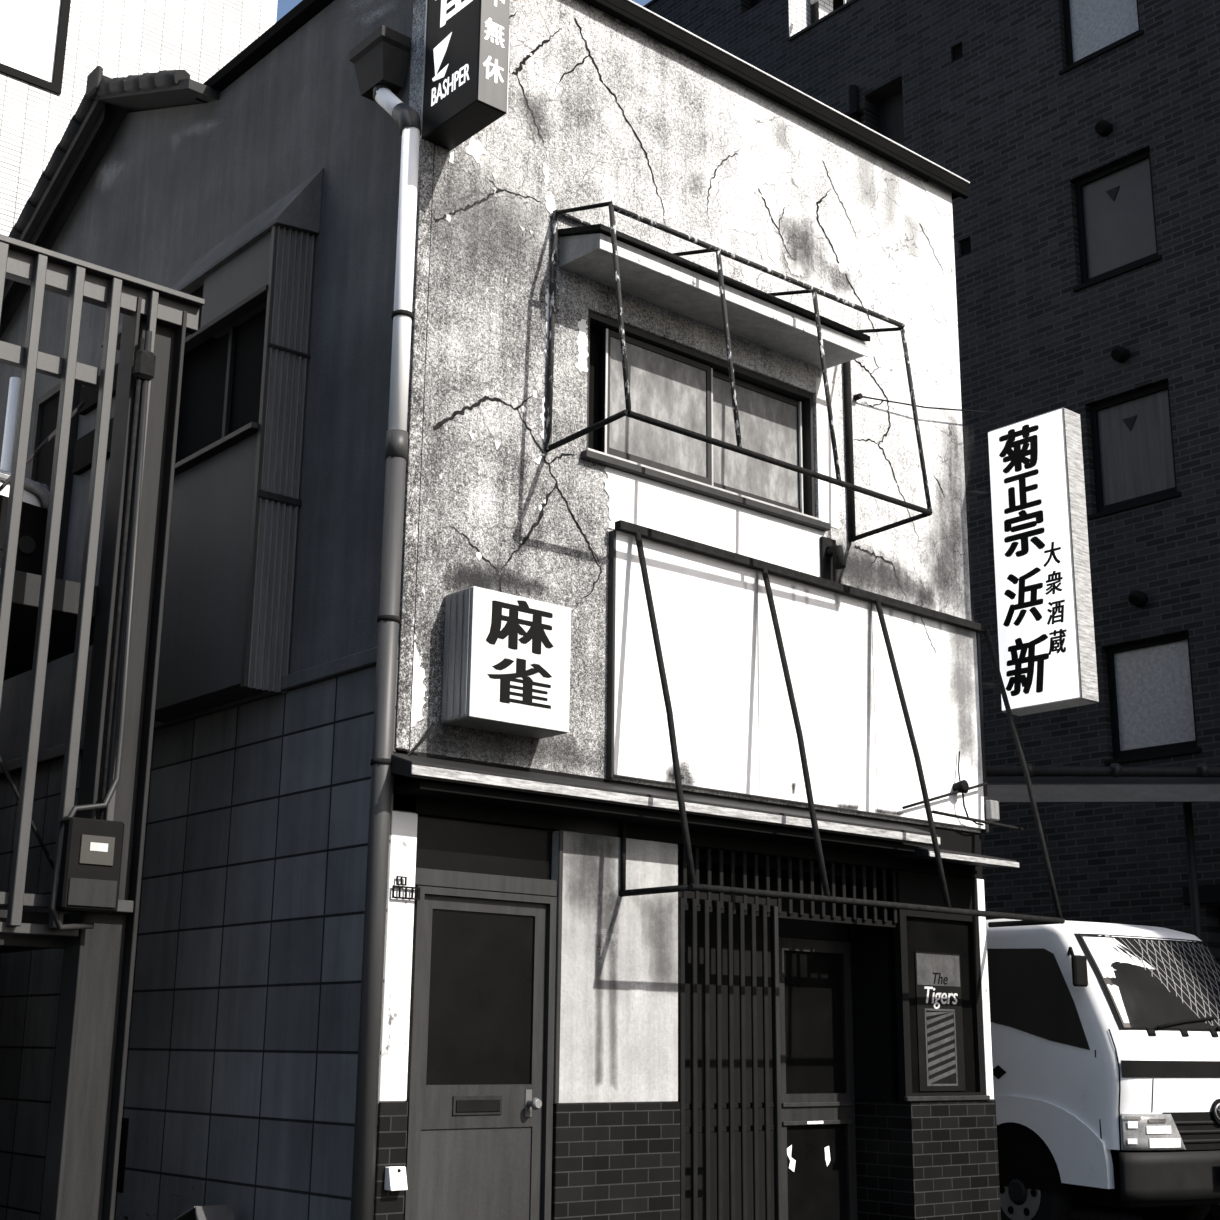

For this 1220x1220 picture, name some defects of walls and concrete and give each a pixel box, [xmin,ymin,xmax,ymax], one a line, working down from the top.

crack [509,18,666,226]
peeling [449,136,499,179]
peeling [542,151,556,216]
crack [707,153,738,225]
crack [758,188,791,257]
peeling [784,253,808,277]
water stain [788,225,822,271]
water stain [831,268,849,289]
crack [814,160,919,538]
crack [433,390,602,612]
water stain [574,826,617,1081]